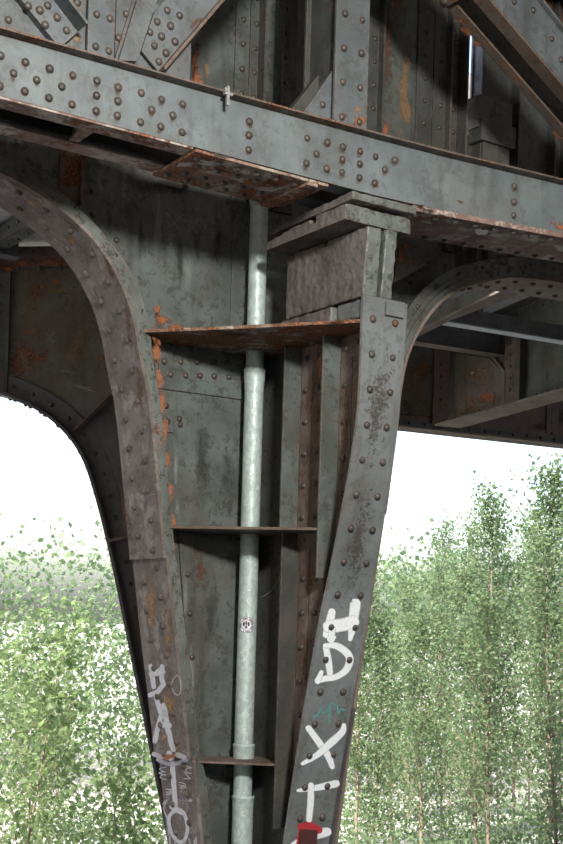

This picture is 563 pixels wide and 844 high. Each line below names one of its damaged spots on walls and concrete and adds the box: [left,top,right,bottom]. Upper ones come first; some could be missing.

peeling [174,153,279,184]
rust [243,174,298,188]
peeling [443,218,504,239]
rust [264,320,345,336]
rust [152,306,182,440]